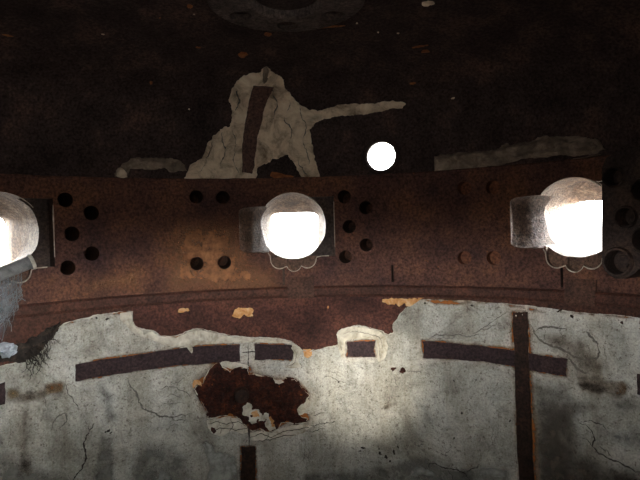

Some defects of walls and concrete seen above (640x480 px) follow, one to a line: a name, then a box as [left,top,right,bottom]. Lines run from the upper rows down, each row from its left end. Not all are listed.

rust [174,226,265,287]
peeling [0,296,640,368]
crack [425,310,510,340]
crack [126,376,192,429]
spalling [193,361,311,441]
crack [73,424,94,480]